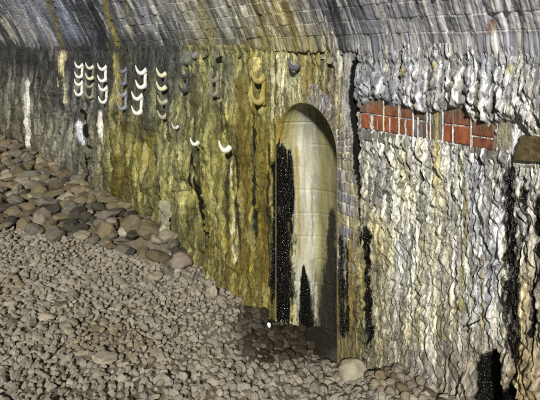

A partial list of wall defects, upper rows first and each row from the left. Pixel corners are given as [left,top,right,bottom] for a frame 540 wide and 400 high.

efflorescence [75,120,85,146]
leakage [111,123,129,201]
leakage [225,141,258,265]
leakage [262,0,350,340]
spalling [360,99,495,160]
flaking render [514,135,540,162]
leakage [359,226,374,349]
leakage [476,161,540,400]